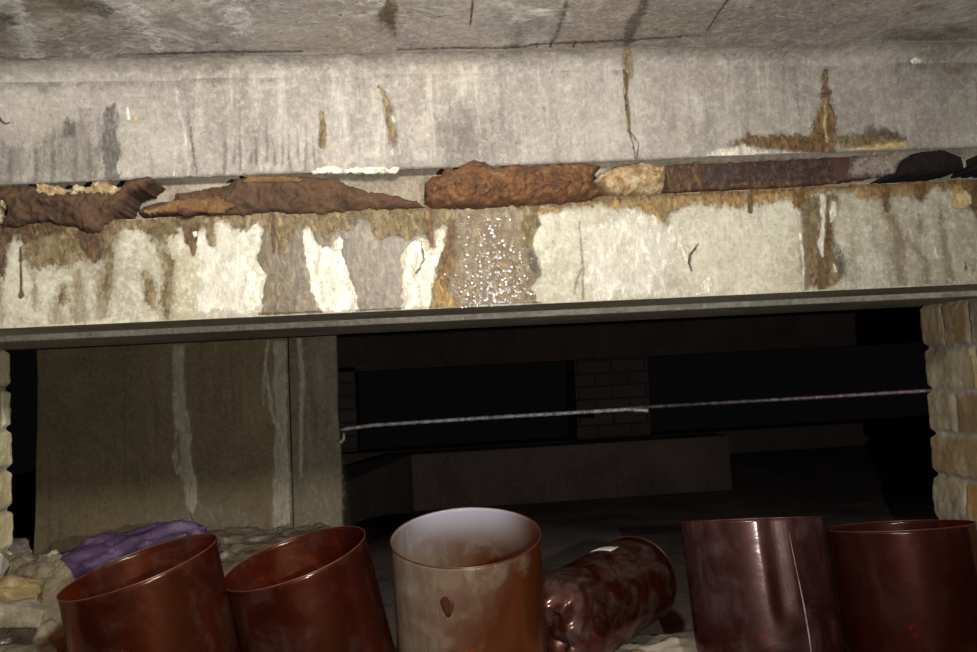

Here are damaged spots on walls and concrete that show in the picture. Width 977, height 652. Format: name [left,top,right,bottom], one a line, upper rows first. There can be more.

corrosion [378,0,397,35]
crack [397,0,729,159]
leakage [196,205,542,315]
corrosion [0,69,977,320]